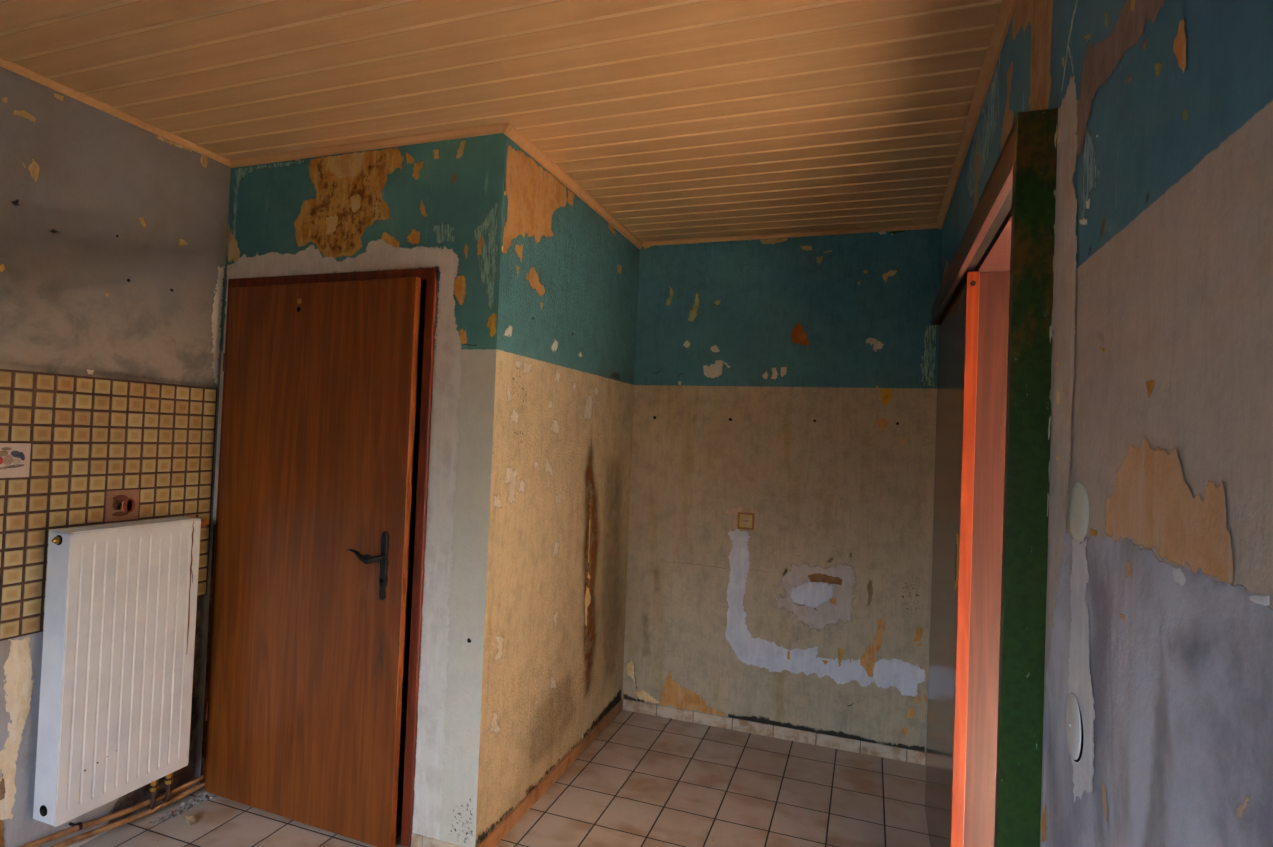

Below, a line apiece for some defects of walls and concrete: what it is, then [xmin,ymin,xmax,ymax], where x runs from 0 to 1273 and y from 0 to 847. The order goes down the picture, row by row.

peeling [294,147,439,259]
peeling [502,145,574,309]
peeling [791,323,809,346]
peeling [0,636,35,847]
peeling [627,661,726,716]
spalling [775,562,857,631]
peeling [860,618,885,677]
flaking render [1041,438,1273,847]